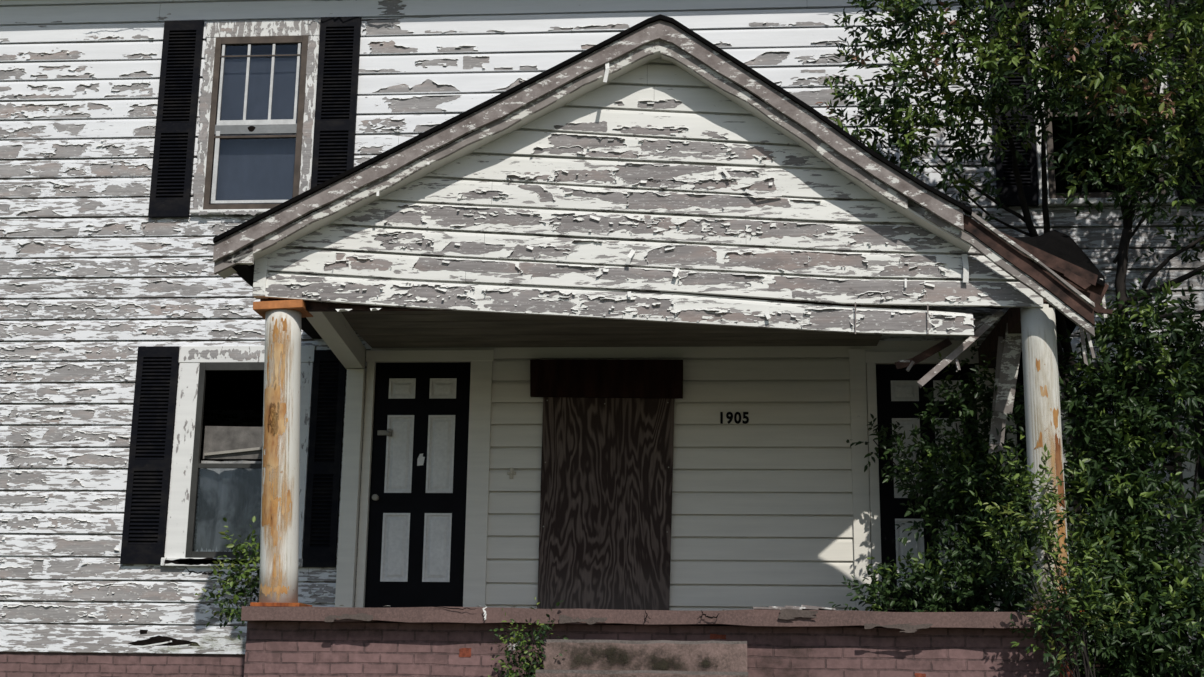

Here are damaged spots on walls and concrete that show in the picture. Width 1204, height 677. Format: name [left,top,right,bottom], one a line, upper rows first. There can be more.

peeling [221,26,298,34]
peeling [299,40,317,194]
peeling [354,0,538,164]
peeling [548,23,630,31]
peeling [614,99,682,109]
peeling [744,40,854,125]
peeling [263,121,1037,334]
peeling [0,34,265,624]
corrosion [260,317,292,599]
corrosion [1034,357,1069,594]